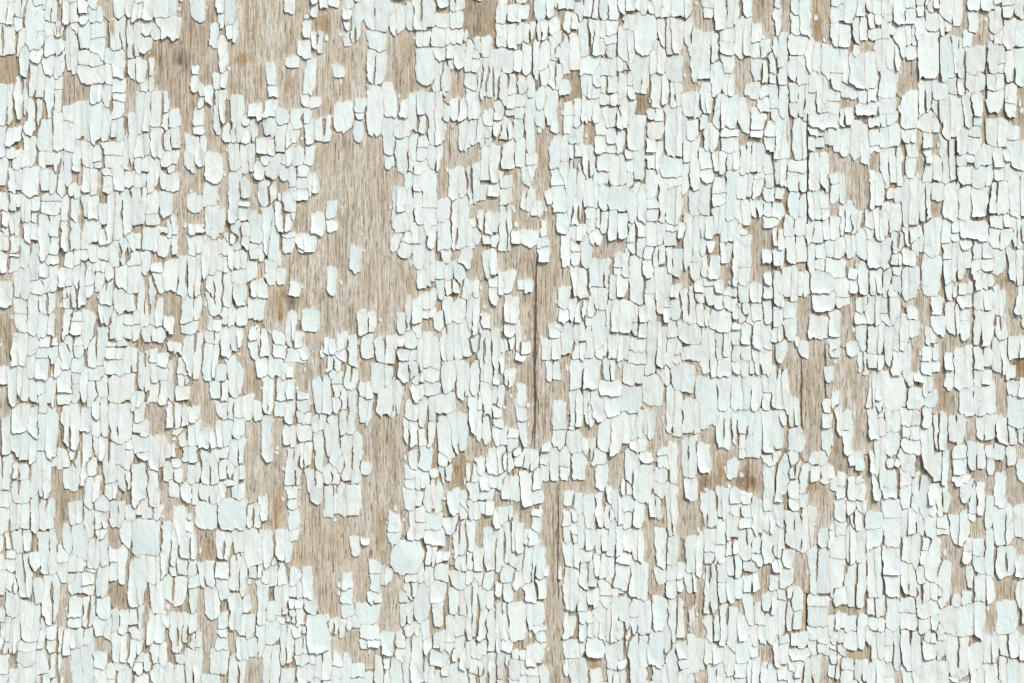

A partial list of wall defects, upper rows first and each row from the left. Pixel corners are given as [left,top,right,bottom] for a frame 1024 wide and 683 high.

peeling [0,23,30,158]
peeling [0,251,30,508]
peeling [41,0,447,683]
crack [0,0,577,683]
peeling [421,0,1024,683]
crack [471,0,1024,683]